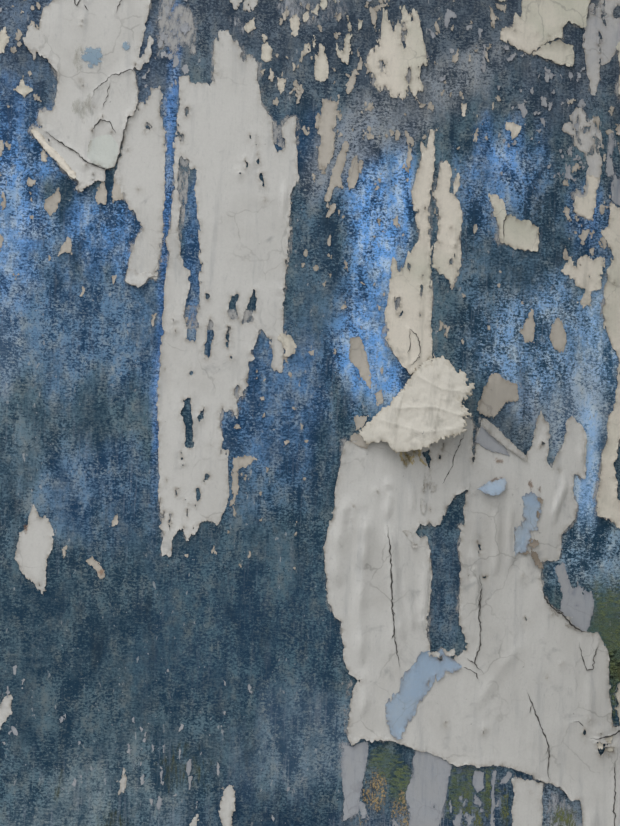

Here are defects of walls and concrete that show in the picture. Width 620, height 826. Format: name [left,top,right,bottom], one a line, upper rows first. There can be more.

crack [47,69,134,169]
peeling [0,0,467,557]
peeling [466,0,620,528]
peeling [323,126,620,826]
peeling [15,504,67,594]
peeling [86,556,105,579]
leakage [605,627,620,715]
peeling [179,749,202,790]
peeling [218,785,236,826]
leakage [362,766,412,826]
crack [528,694,550,768]